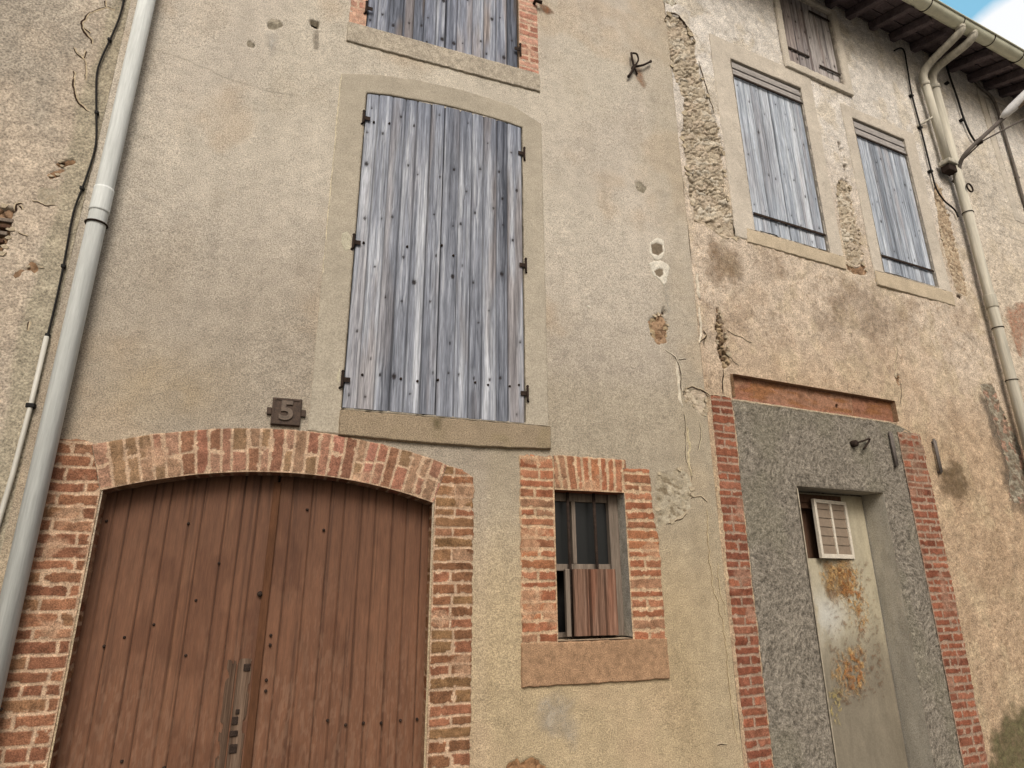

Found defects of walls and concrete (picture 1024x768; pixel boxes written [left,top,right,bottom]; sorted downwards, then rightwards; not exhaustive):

spalling [663,0,739,242]
spalling [0,203,15,256]
spalling [836,180,868,275]
spalling [934,182,967,296]
spalling [648,312,670,345]
spalling [715,309,731,368]
crack [666,329,752,464]
corrosion [822,560,868,625]